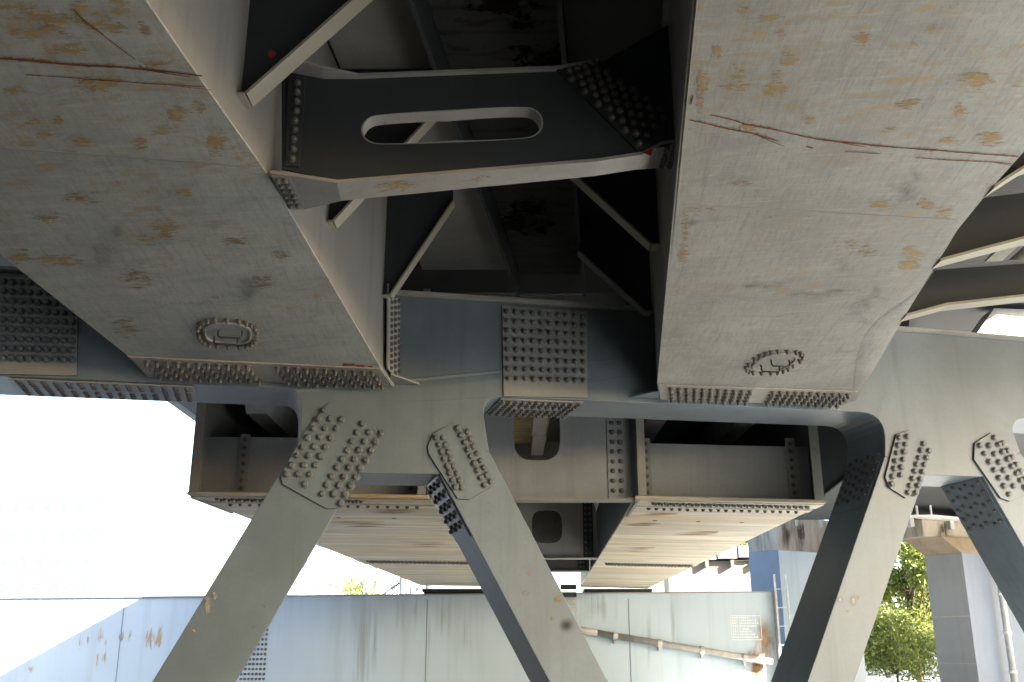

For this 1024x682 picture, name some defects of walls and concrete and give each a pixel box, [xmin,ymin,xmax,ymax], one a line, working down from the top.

crack [73,9,135,59]
rust [0,0,211,150]
rust [690,64,1021,167]
rust [752,626,771,677]